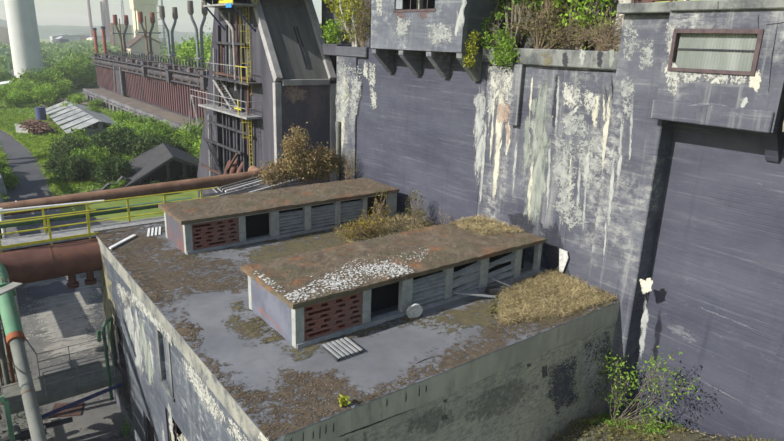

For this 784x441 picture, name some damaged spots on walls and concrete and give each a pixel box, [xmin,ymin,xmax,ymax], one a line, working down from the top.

leakage [597,50,615,68]
peeling [623,19,654,71]
peeling [664,20,761,96]
leakage [340,77,349,148]
peeling [621,76,635,123]
leakage [473,75,570,275]
leakage [560,145,590,227]
leakage [592,95,634,259]
spalling [639,278,653,294]
spalling [639,305,649,356]